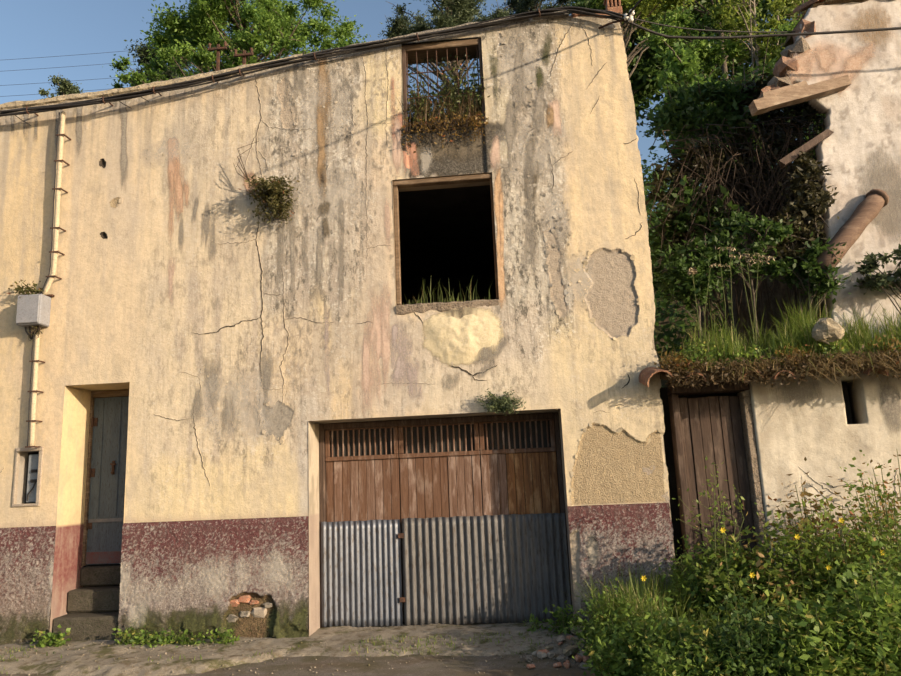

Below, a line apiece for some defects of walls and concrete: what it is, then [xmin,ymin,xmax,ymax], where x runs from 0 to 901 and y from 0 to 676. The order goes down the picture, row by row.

peeling [788,49,815,82]
peeling [832,44,874,82]
rust [168,138,189,231]
flaking render [504,102,640,340]
crack [192,215,373,428]
crack [154,371,211,486]
peeling [257,400,294,445]
flaking render [570,422,666,505]
spalling [223,592,277,638]